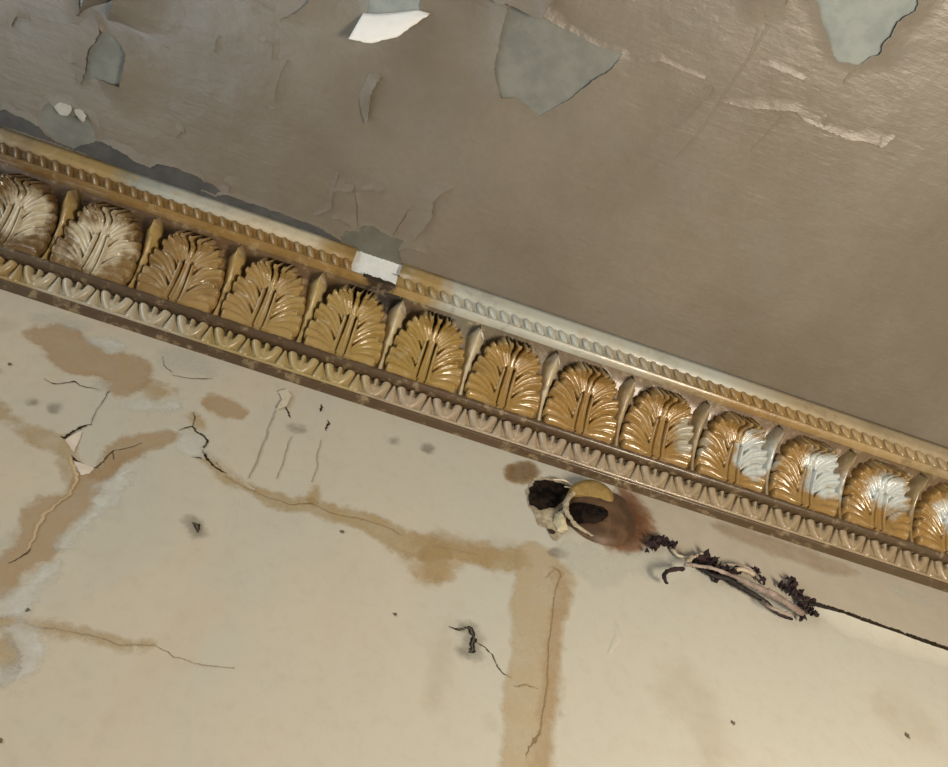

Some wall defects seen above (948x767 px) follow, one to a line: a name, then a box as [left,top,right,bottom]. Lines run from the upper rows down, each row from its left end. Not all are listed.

peeling [468,0,707,125]
peeling [730,0,945,85]
peeling [0,0,403,287]
crack [47,380,138,468]
leakage [29,325,180,411]
leakage [202,397,247,418]
crack [181,412,402,536]
leakage [505,462,538,483]
leakage [0,432,206,685]
crack [476,566,561,756]
flaking render [526,476,948,669]
crack [816,603,948,651]